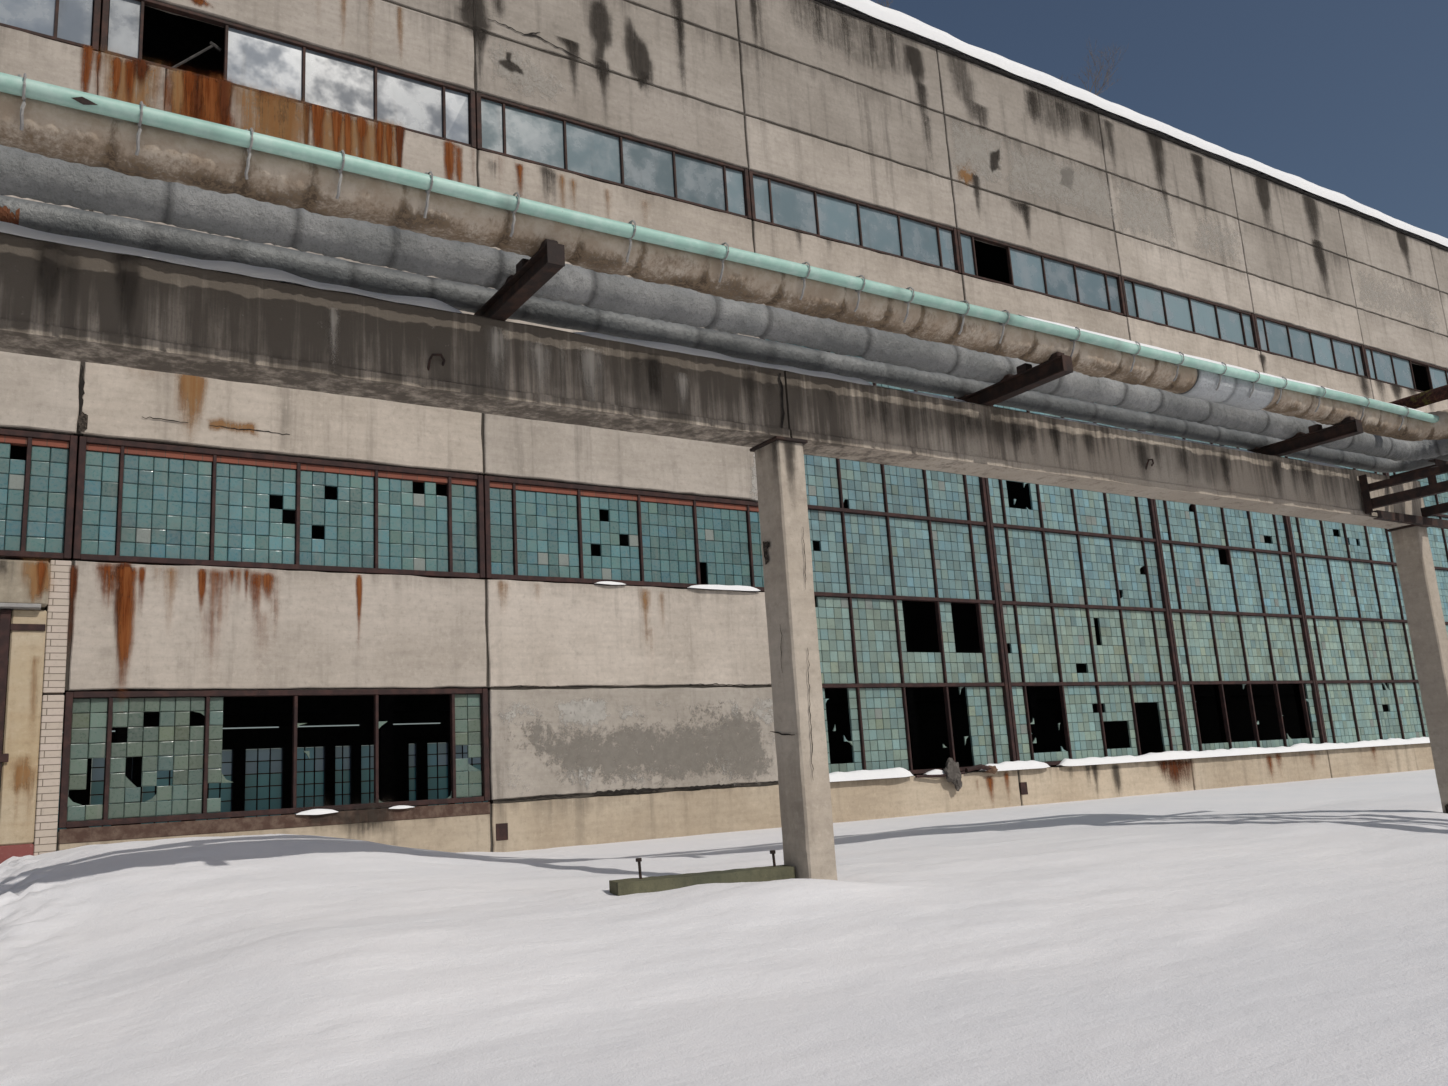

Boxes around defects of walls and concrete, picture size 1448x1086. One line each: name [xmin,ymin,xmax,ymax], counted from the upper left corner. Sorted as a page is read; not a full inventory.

damp [461,0,501,60]
damp [590,0,652,90]
corrosion [81,45,405,168]
damp [1147,133,1164,185]
damp [1256,177,1270,217]
damp [1303,195,1327,283]
damp [1396,231,1408,263]
corrosion [180,374,255,434]
corrosion [69,565,78,633]
corrosion [100,562,145,670]
corrosion [198,569,273,605]
spalling [500,698,775,785]